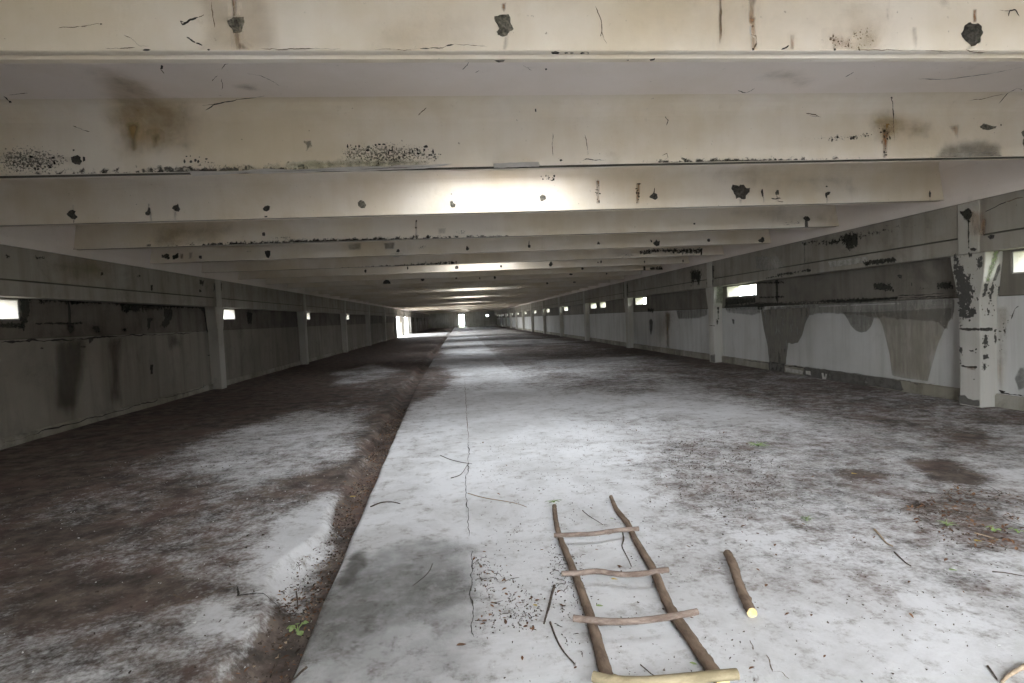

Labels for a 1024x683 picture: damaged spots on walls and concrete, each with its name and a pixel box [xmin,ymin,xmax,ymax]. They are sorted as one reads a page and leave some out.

spalling [494,4,513,37]
spalling [961,10,983,46]
damp [0,146,308,174]
damp [343,143,441,166]
rust [877,120,896,156]
spalling [731,184,783,202]
peeling [952,248,1000,343]
crack [465,389,474,636]